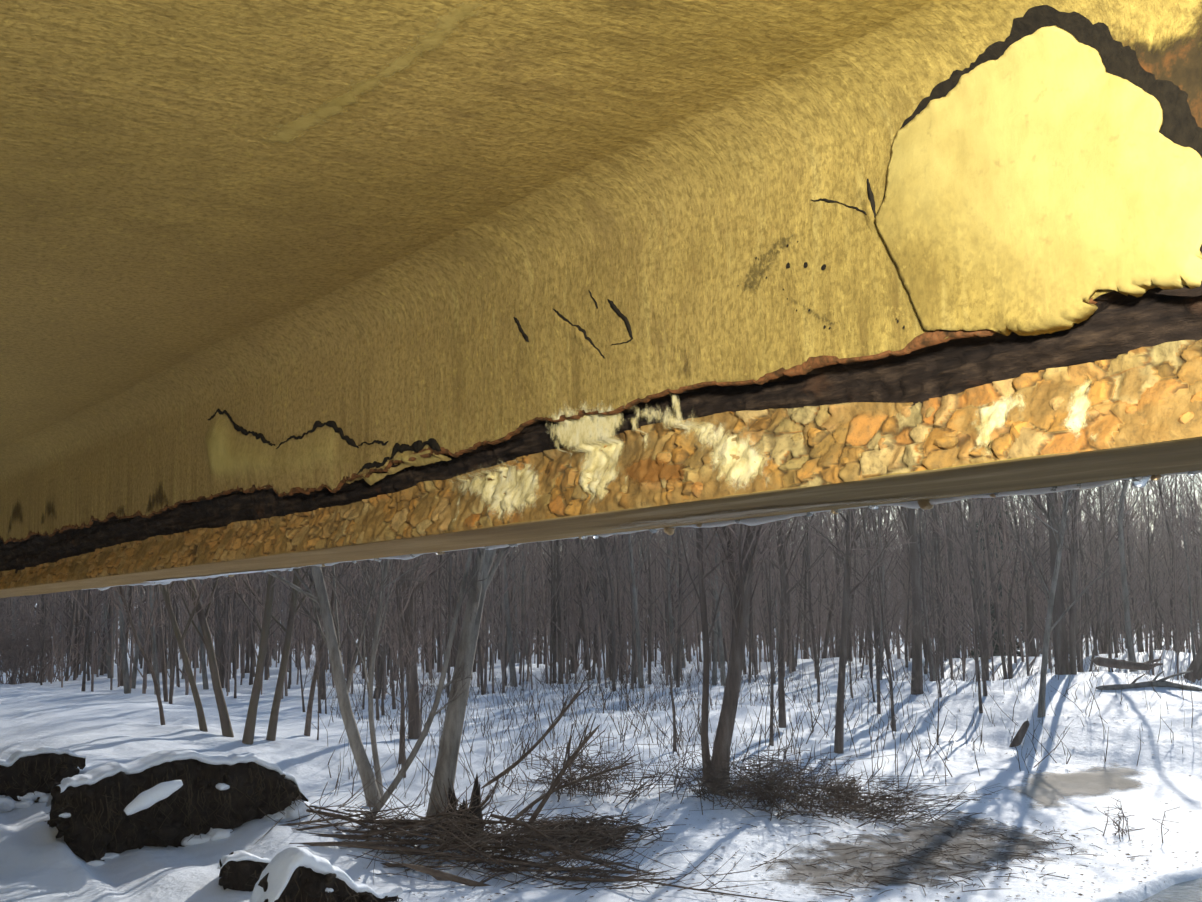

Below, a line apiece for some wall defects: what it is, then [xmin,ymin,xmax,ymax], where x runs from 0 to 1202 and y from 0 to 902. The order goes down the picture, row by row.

crack [810,179,879,236]
crack [514,290,633,374]
spalling [0,5,1202,590]
leakage [551,394,771,502]
leakage [453,464,539,520]